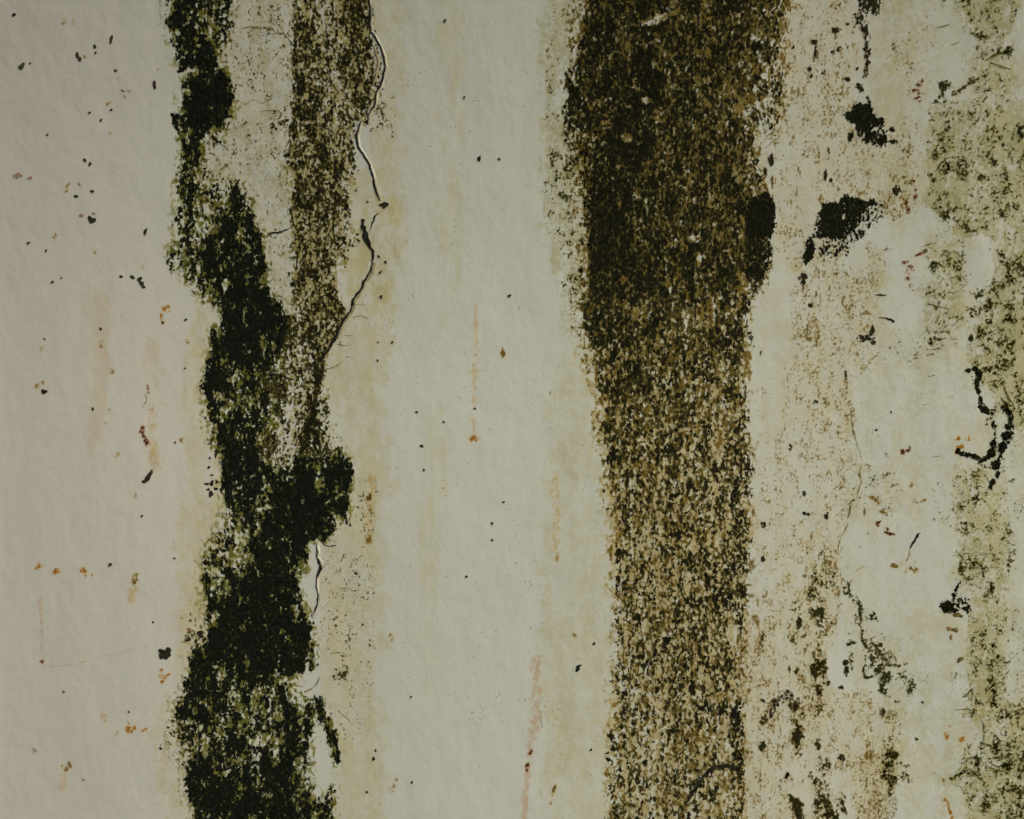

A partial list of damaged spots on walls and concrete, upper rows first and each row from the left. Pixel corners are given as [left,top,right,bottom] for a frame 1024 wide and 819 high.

leakage [161,0,396,819]
crack [273,0,388,380]
leakage [544,0,1024,819]